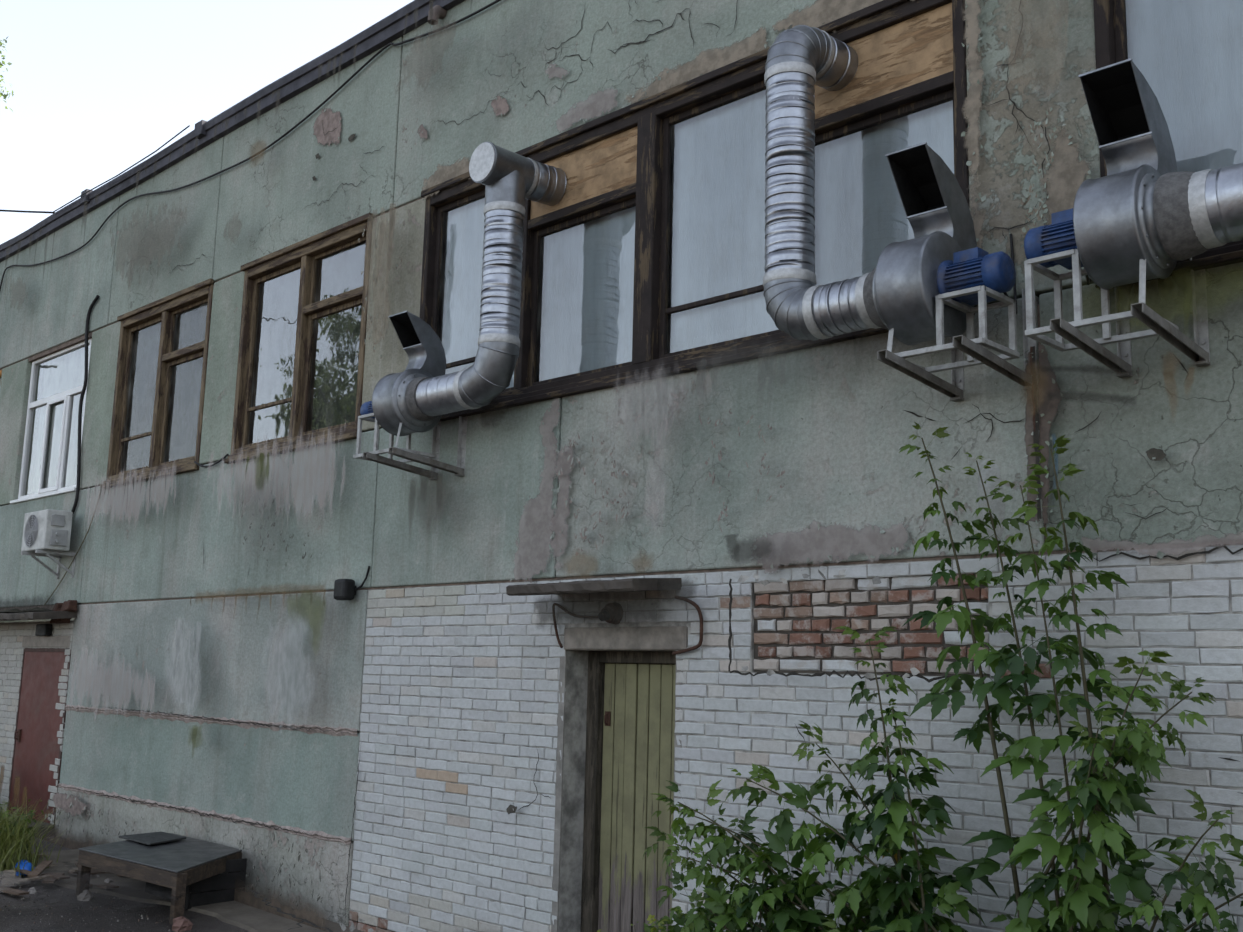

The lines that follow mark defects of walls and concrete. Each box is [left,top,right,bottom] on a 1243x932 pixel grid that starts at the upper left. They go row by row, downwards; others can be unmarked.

crack [433,0,738,124]
spalling [313,107,355,159]
peeling [1020,108,1091,236]
water stain [246,453,269,488]
peeling [510,399,629,583]
water stain [168,620,201,710]
water stain [267,594,324,722]
flaking render [720,521,1051,683]
crack [1084,545,1243,562]